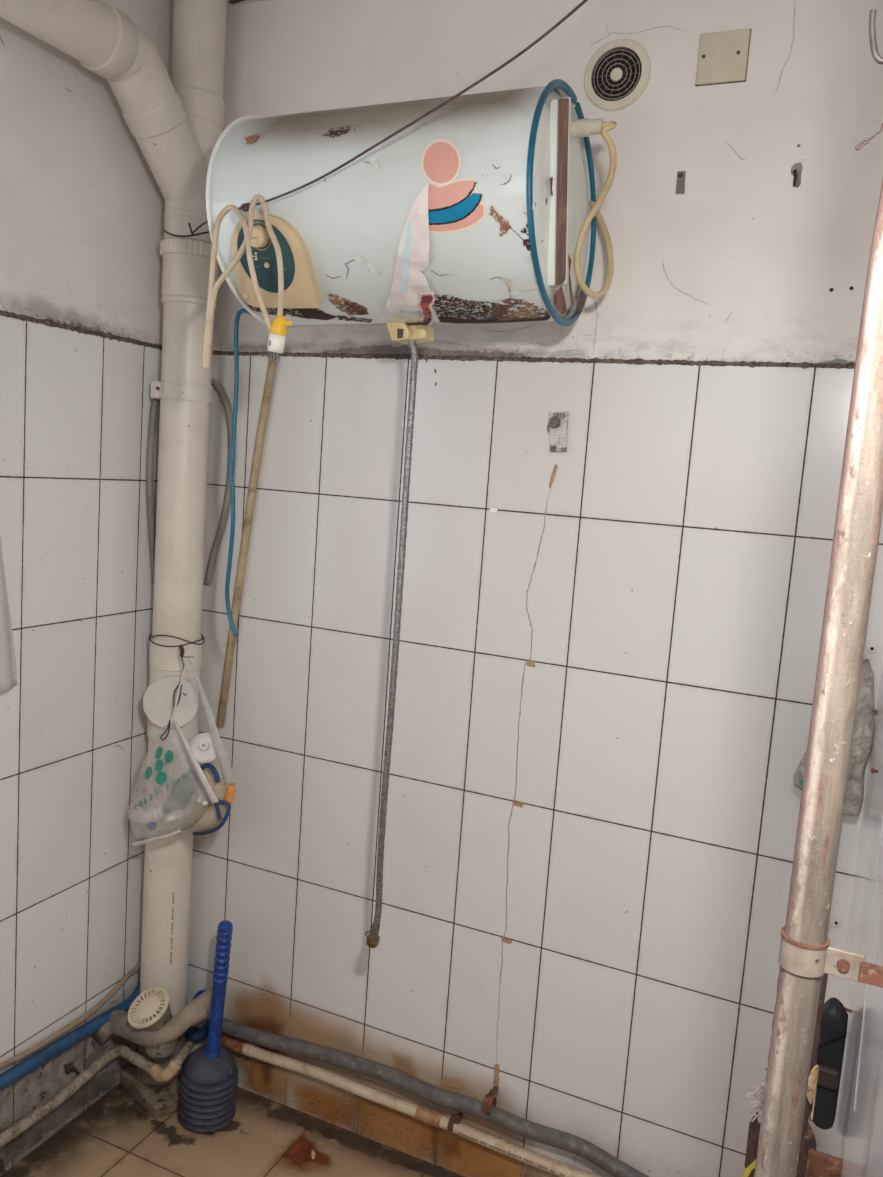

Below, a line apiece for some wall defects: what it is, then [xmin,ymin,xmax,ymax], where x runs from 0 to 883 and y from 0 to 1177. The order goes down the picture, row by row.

crack [774,0,795,95]
crack [493,464,558,1093]
rust [280,1136,329,1171]
rust [302,1091,519,1177]